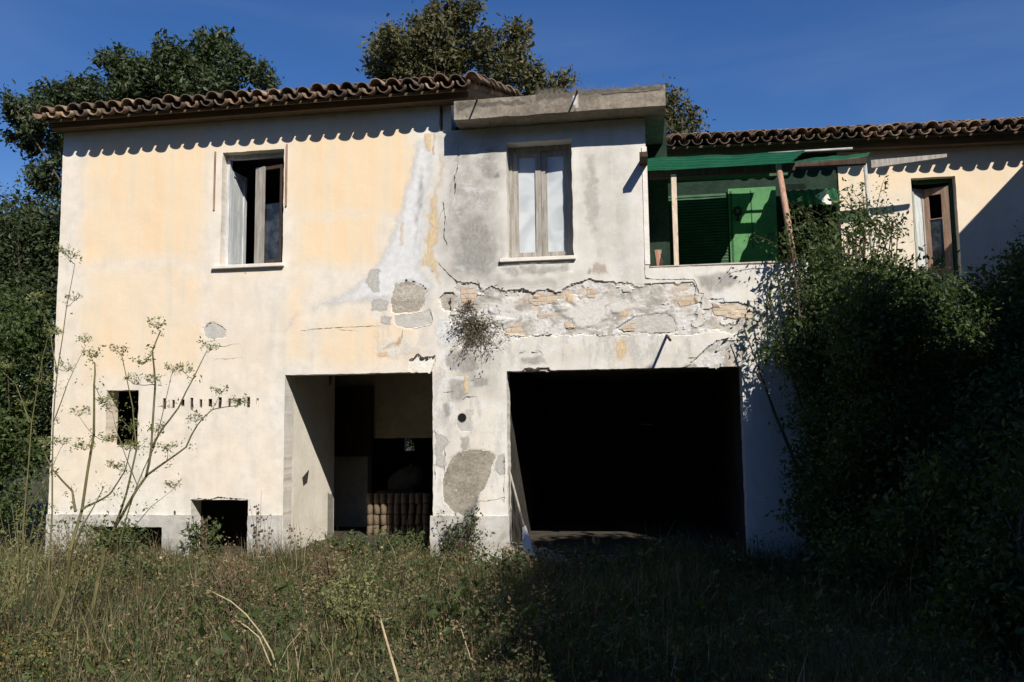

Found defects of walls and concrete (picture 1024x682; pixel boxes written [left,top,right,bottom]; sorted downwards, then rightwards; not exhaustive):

damp [329,133,439,302]
peeling [204,323,225,339]
spalling [367,269,432,328]
spalling [410,356,434,373]
spalling [440,280,763,369]
spalling [435,434,505,516]